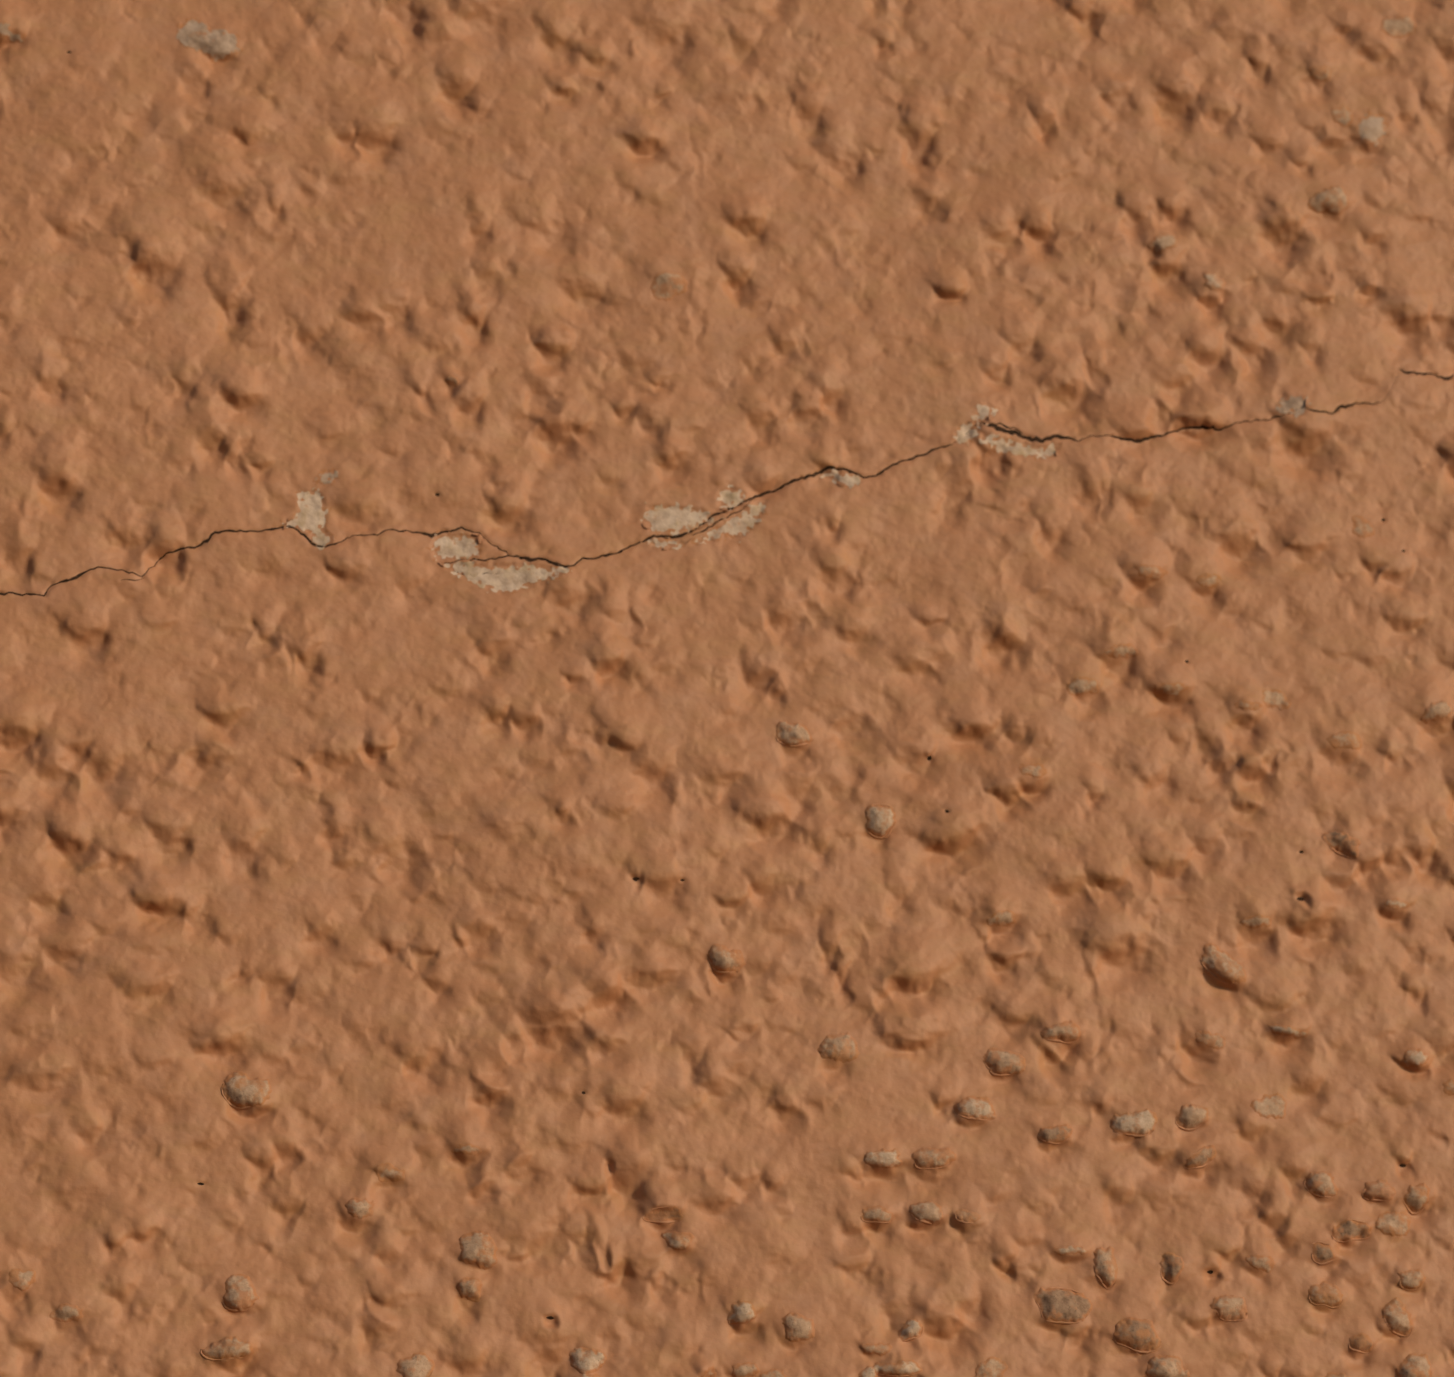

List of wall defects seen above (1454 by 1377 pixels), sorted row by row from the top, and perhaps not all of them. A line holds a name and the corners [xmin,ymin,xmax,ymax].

peeling [951,401,1061,461]
crack [0,369,1454,597]
peeling [280,487,336,551]
peeling [639,484,769,551]
peeling [426,530,573,594]